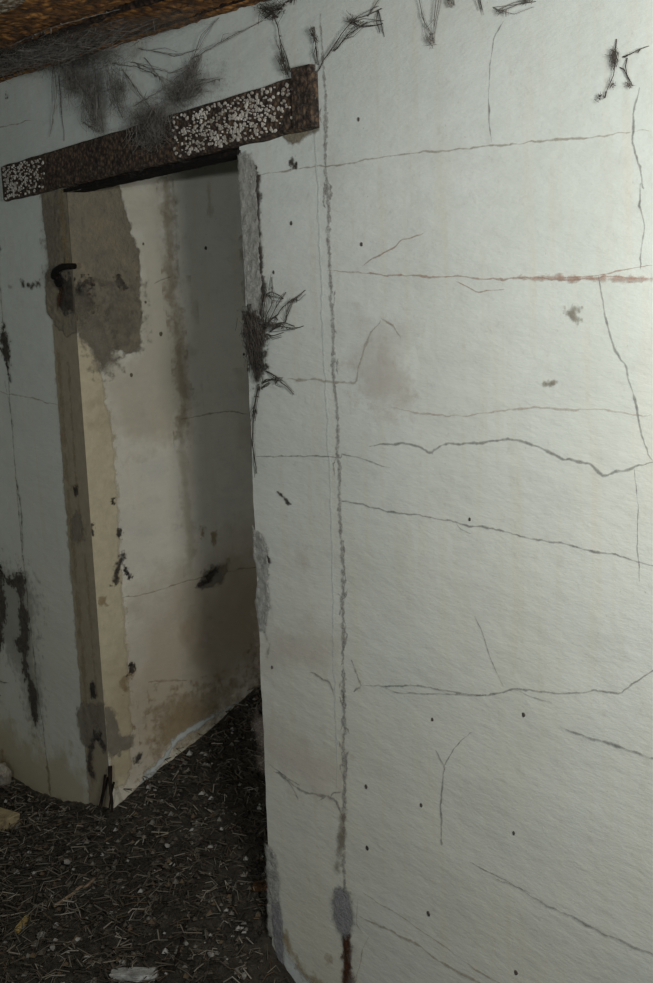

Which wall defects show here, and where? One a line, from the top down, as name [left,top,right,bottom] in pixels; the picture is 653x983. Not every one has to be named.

crack [310,14,541,890]
leakage [0,564,39,727]
corrosion [335,815,345,871]
corrosion [331,886,355,983]